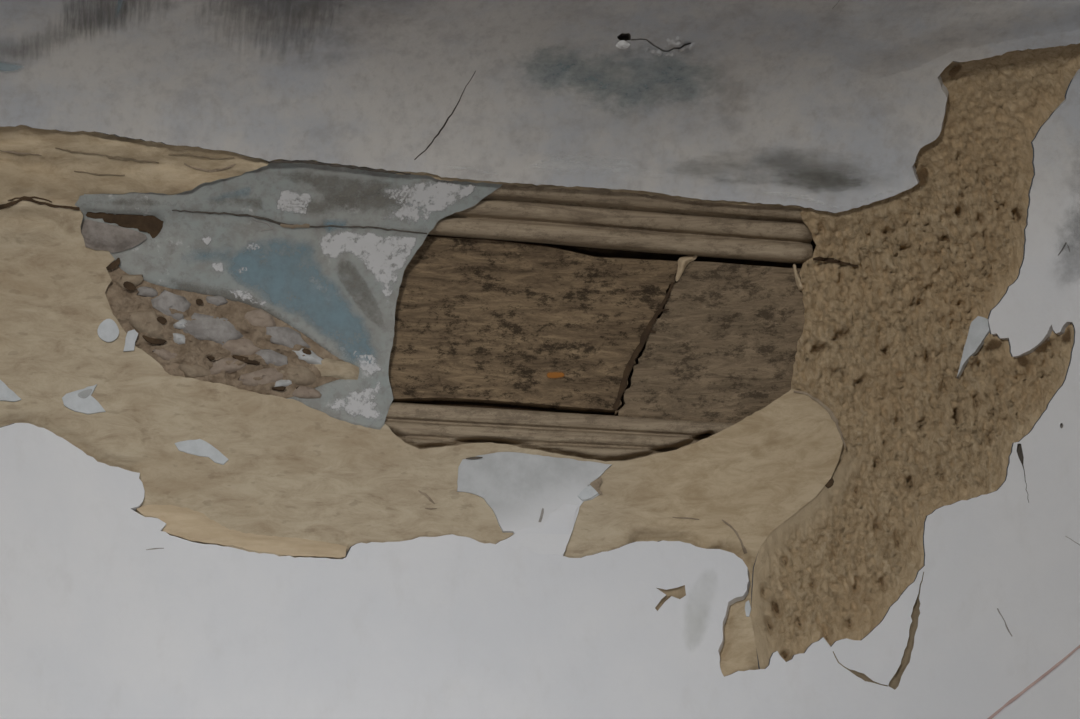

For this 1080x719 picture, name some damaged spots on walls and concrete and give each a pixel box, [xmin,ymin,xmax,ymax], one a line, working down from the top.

flaking render [0,125,270,207]
flaking render [0,163,843,676]
crack [612,282,674,410]
flaking render [607,43,1080,669]